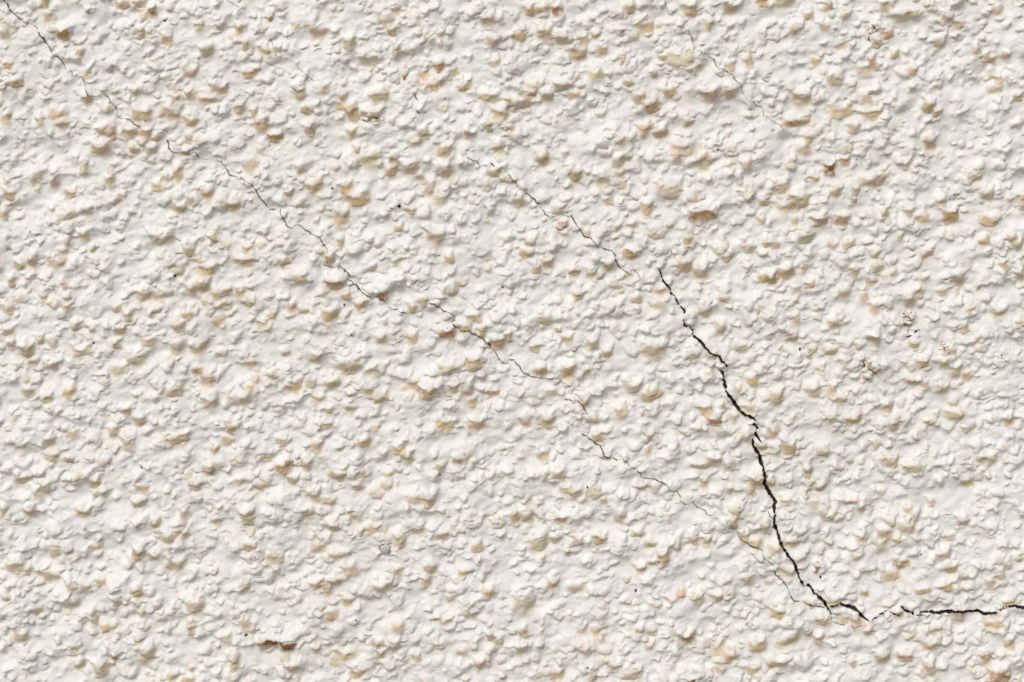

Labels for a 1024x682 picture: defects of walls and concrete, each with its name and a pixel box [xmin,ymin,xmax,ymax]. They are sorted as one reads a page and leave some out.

crack [3,0,587,412]
crack [665,1,784,130]
crack [460,154,1024,629]